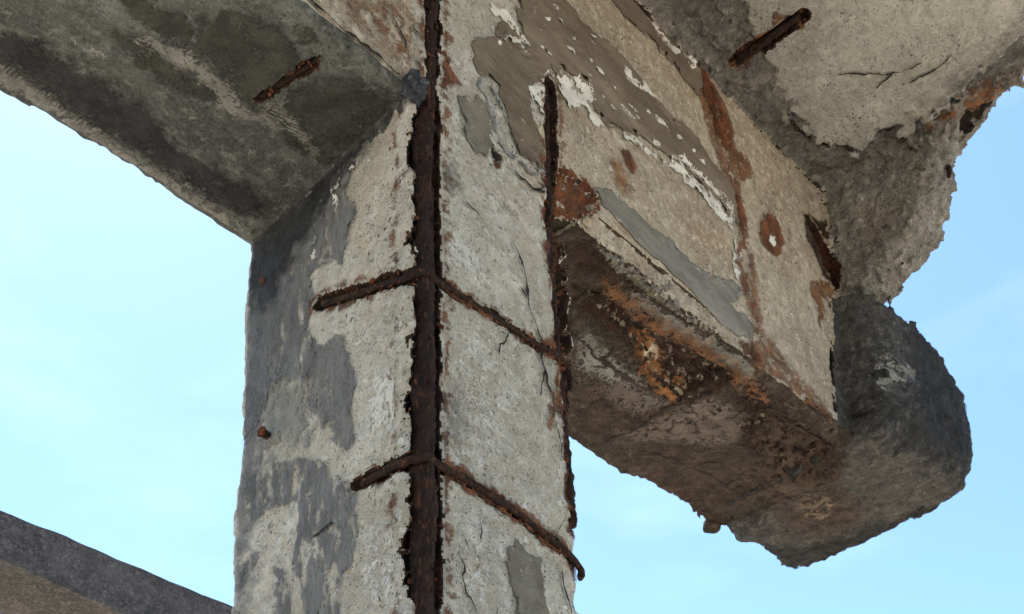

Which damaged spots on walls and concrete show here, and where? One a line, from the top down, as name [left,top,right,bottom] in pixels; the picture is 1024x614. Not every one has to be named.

spalling [728,8,812,67]
crack [838,56,951,89]
spalling [959,100,993,135]
damp [0,0,395,614]
corrosion [308,263,427,315]
corrosion [436,277,574,431]
crack [512,240,564,455]
corrosion [545,167,601,266]
peeling [471,0,755,540]
corrosion [573,65,864,538]
spalling [805,214,842,291]
corrosion [445,458,584,581]